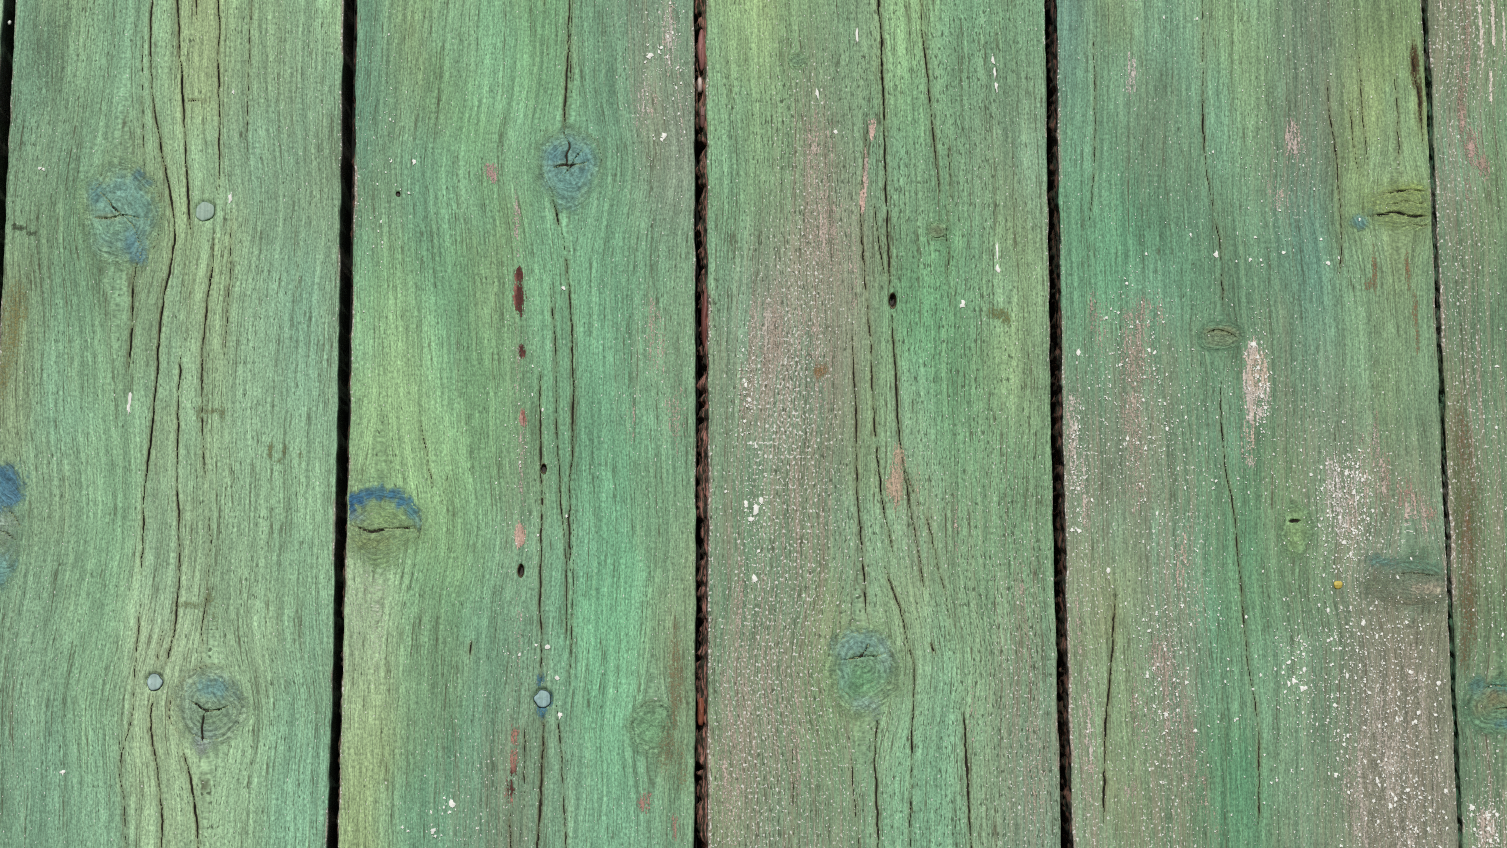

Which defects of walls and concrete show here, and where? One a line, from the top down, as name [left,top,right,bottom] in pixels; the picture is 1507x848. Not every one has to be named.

crack [99,0,251,848]
crack [509,0,602,848]
crack [846,0,951,848]